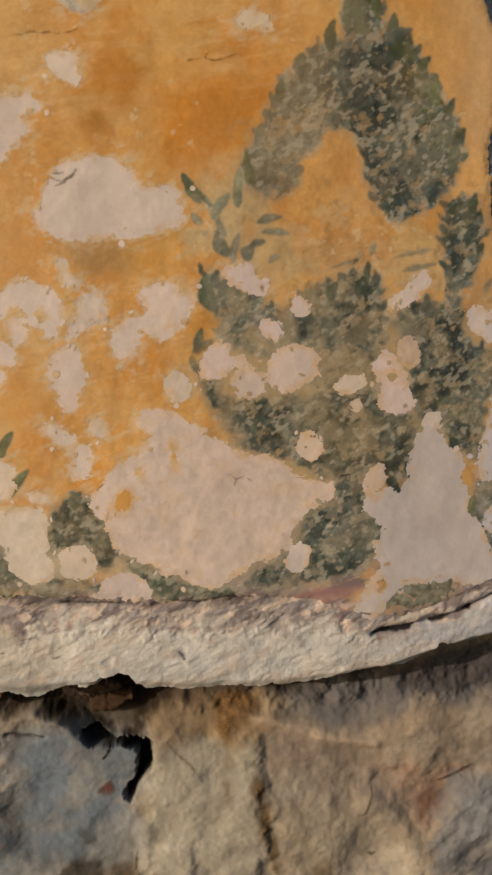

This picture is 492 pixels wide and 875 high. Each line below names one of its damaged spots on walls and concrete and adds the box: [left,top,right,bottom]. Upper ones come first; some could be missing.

flaking render [0,91,49,162]
flaking render [33,152,196,247]
flaking render [221,262,270,297]
flaking render [290,294,312,317]
flaking render [387,269,432,311]
flaking render [464,304,492,343]
flaking render [0,258,202,482]
flaking render [332,335,421,416]
flaking render [0,318,337,603]
flaking render [353,398,492,620]
crack [371,579,492,633]
crack [83,721,151,797]